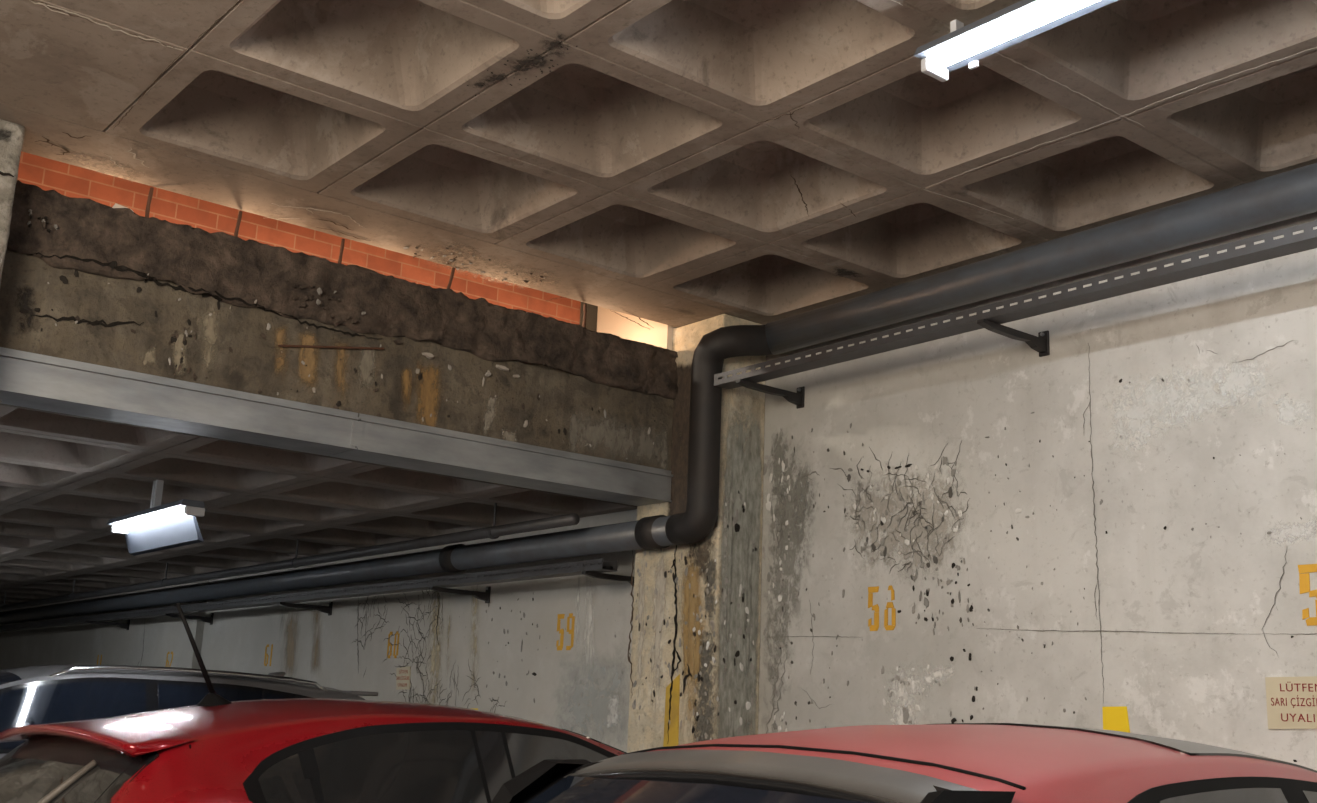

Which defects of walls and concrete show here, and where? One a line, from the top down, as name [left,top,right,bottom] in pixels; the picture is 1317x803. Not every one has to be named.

crack [29,0,240,172]
crack [29,252,383,339]
rust [276,329,318,385]
rust [402,366,439,427]
crack [797,441,970,574]
crack [352,576,506,713]
crack [667,545,692,744]
water stain [689,421,814,742]